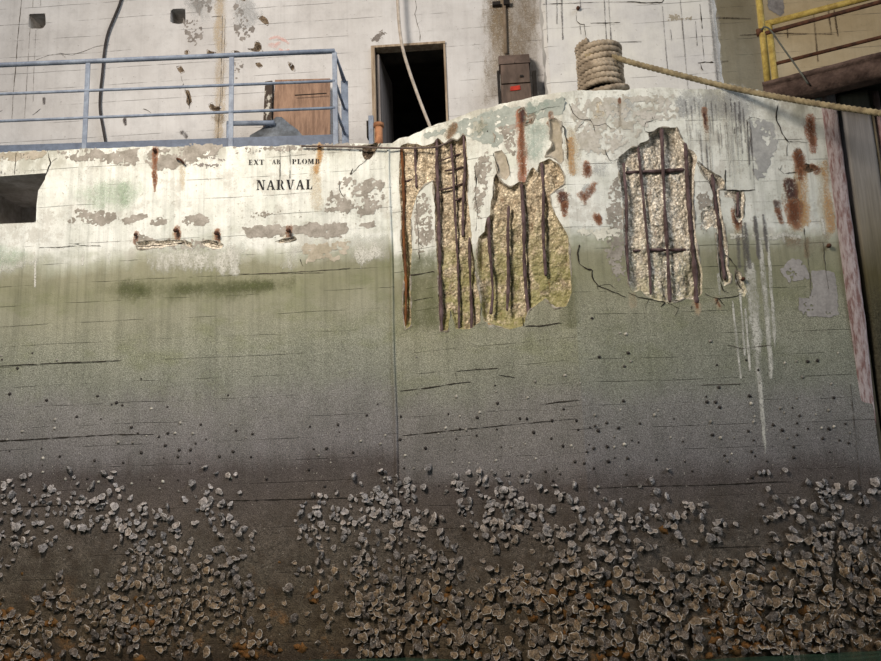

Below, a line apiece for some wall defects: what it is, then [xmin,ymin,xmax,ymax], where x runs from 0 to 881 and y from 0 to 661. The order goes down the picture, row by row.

peeling [231,0,269,79]
peeling [0,142,388,171]
corrosion [516,108,535,182]
crack [747,106,807,173]
corrosion [773,114,828,231]
peeling [67,208,167,226]
spalling [135,233,224,251]
peeling [182,213,210,226]
peeling [242,177,385,264]
spalling [399,94,801,332]
crack [577,245,742,316]
water stain [732,214,808,447]